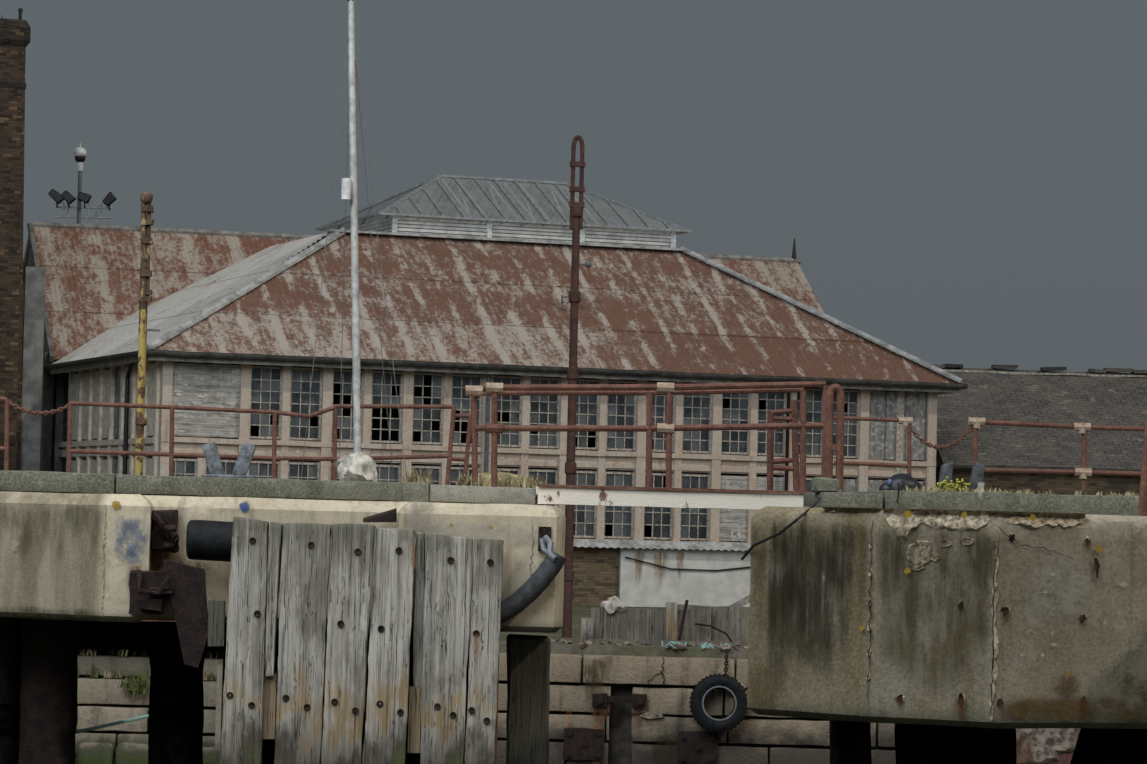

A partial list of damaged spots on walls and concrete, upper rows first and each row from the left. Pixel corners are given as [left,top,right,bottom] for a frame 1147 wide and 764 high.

water stain [756,523,864,672]
crack [865,522,873,715]
spalling [822,507,1091,571]